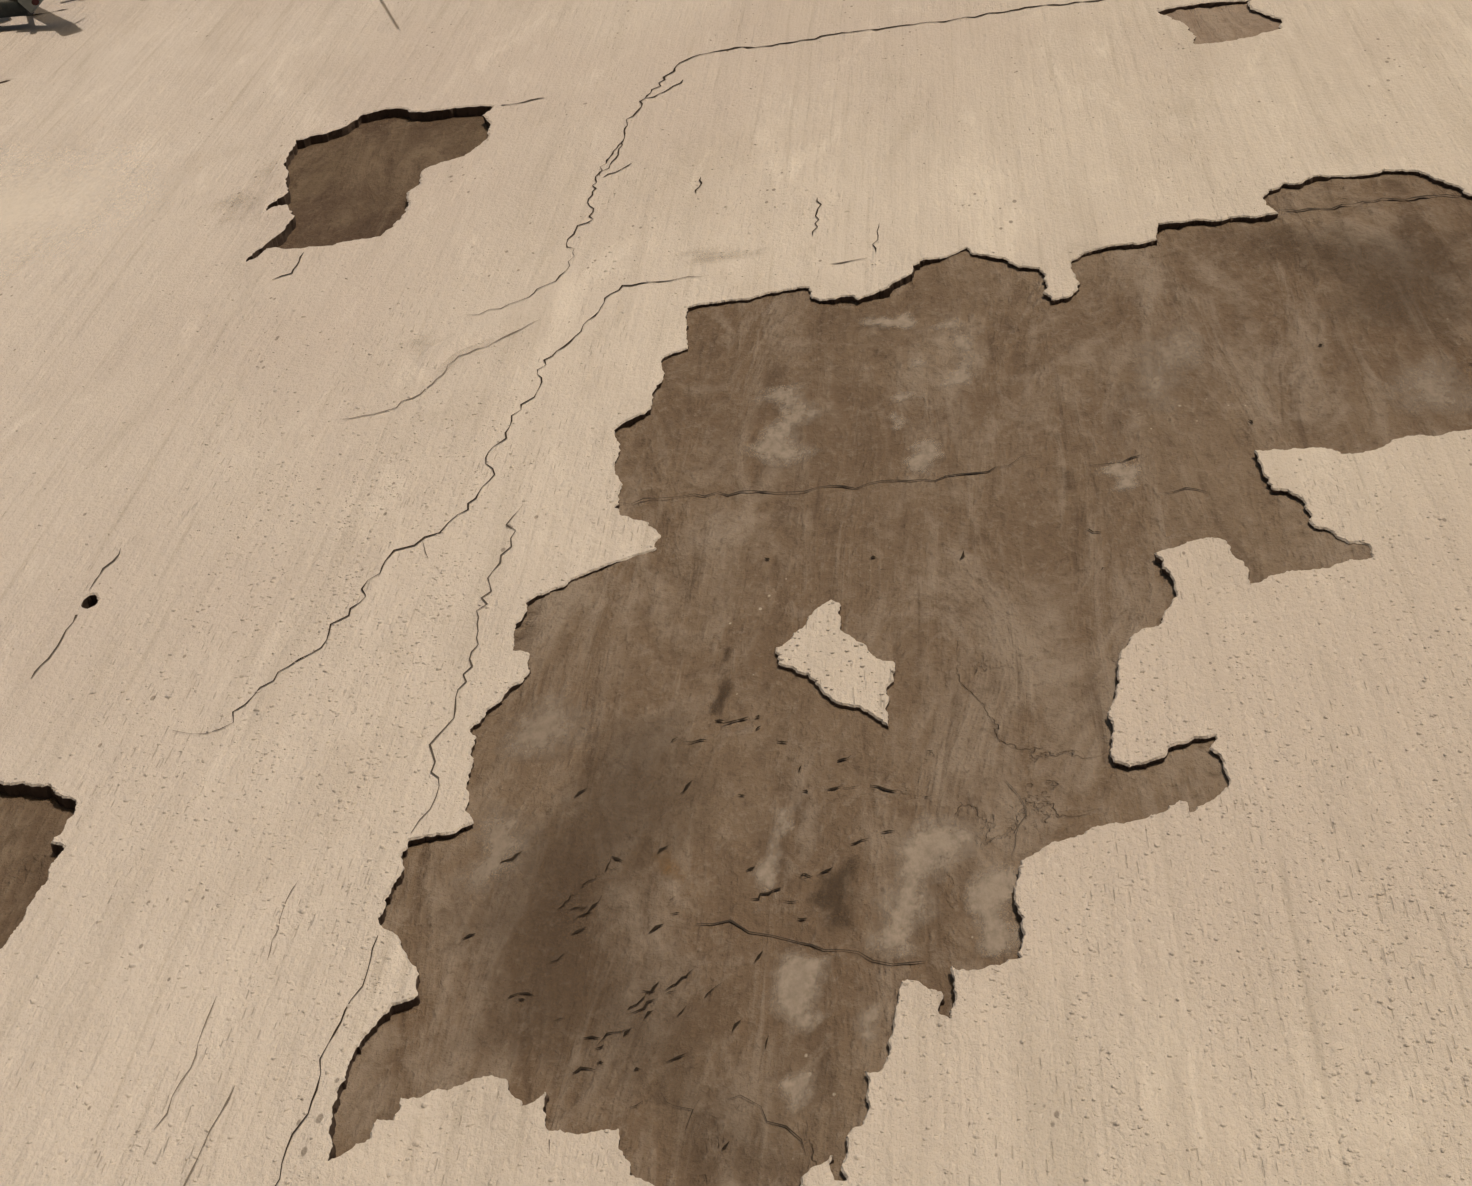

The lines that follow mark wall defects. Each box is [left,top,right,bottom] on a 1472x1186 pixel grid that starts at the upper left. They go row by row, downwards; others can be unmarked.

spalling [1165,3,1281,44]
spalling [278,115,489,249]
crack [346,0,1101,419]
crack [173,275,708,734]
crack [619,455,1031,504]
crack [31,548,121,678]
crack [411,506,522,833]
spalling [332,174,1472,1186]
spalling [0,792,75,949]
crack [155,1000,215,1128]
crack [183,1086,235,1186]
crack [275,935,378,1186]